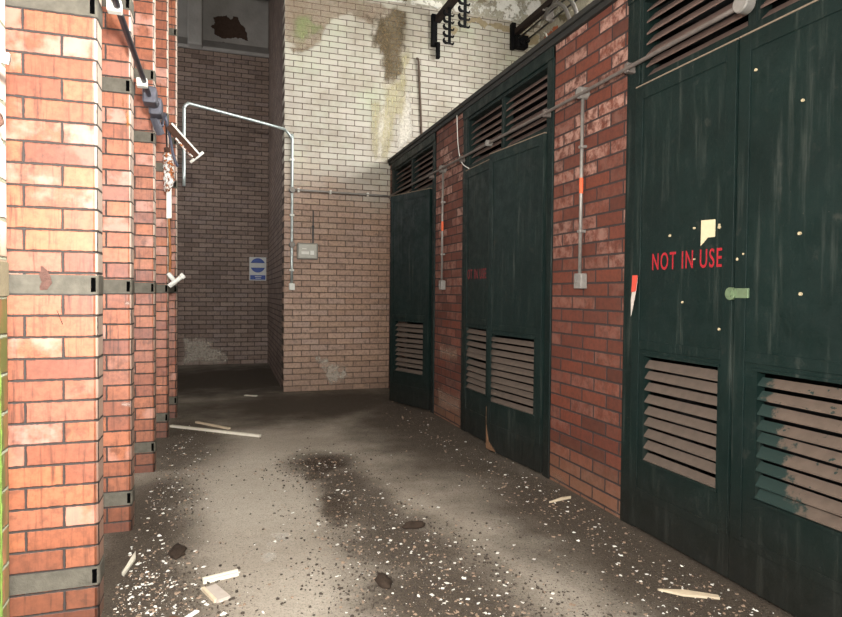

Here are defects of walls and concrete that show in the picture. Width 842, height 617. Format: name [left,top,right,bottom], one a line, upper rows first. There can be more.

damp [374,9,406,80]
damp [376,95,412,156]